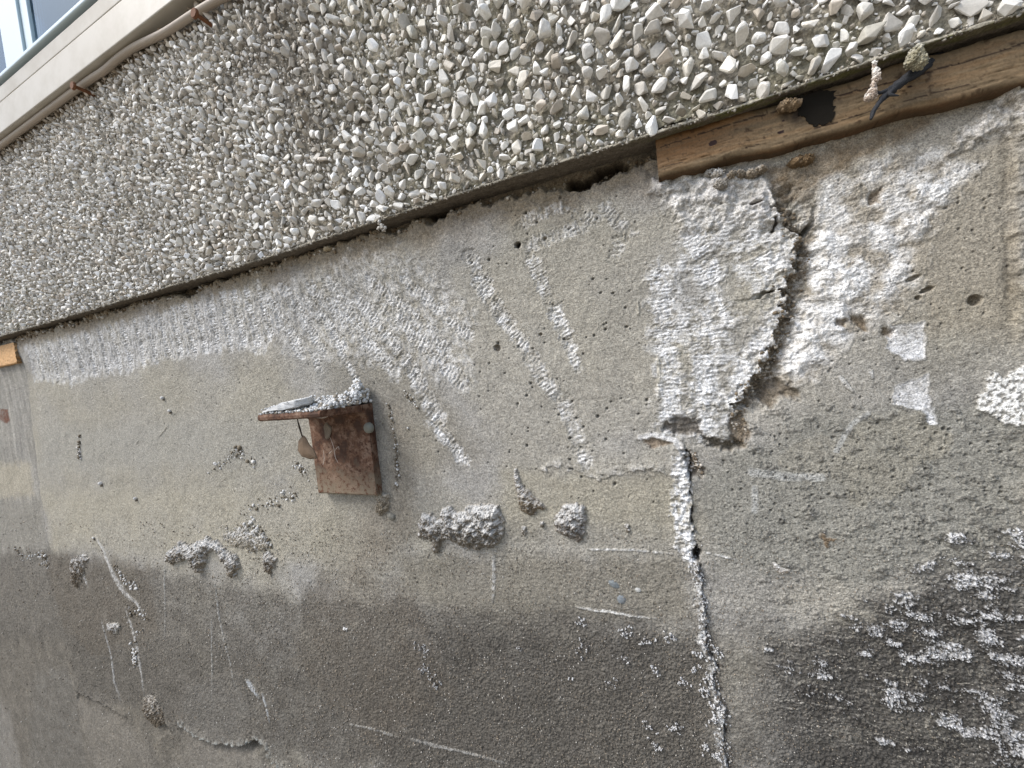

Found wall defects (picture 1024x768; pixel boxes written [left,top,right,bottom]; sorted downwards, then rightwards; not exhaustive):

peeling [262,397,314,412]
spalling [0,0,1024,335]
damp [0,374,1024,768]
crack [661,183,819,768]
spalling [646,86,1024,391]